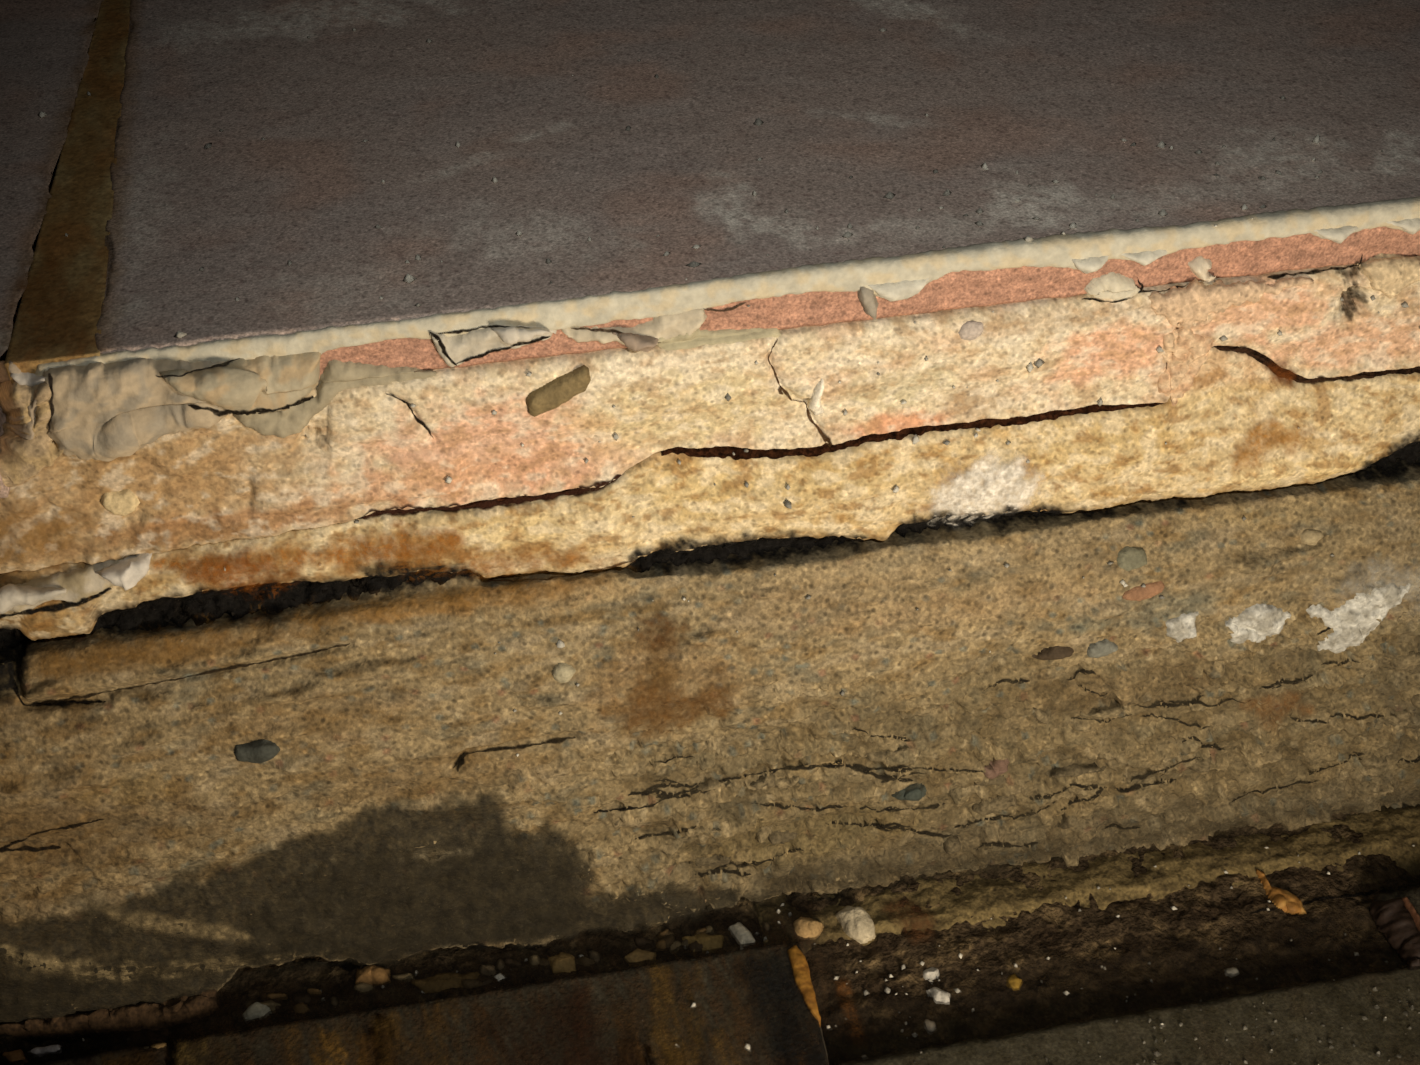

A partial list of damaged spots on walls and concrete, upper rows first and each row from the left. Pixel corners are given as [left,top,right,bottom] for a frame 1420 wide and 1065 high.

crack [1083,277,1215,303]
peeling [429,309,707,368]
crack [1212,346,1420,384]
crack [387,394,434,439]
crack [661,339,1167,460]
crack [357,475,622,519]
peeling [0,553,152,618]
water stain [1166,611,1199,643]
water stain [1225,583,1411,653]
crack [453,737,575,771]
crack [594,760,984,813]
water stain [0,794,1420,1065]